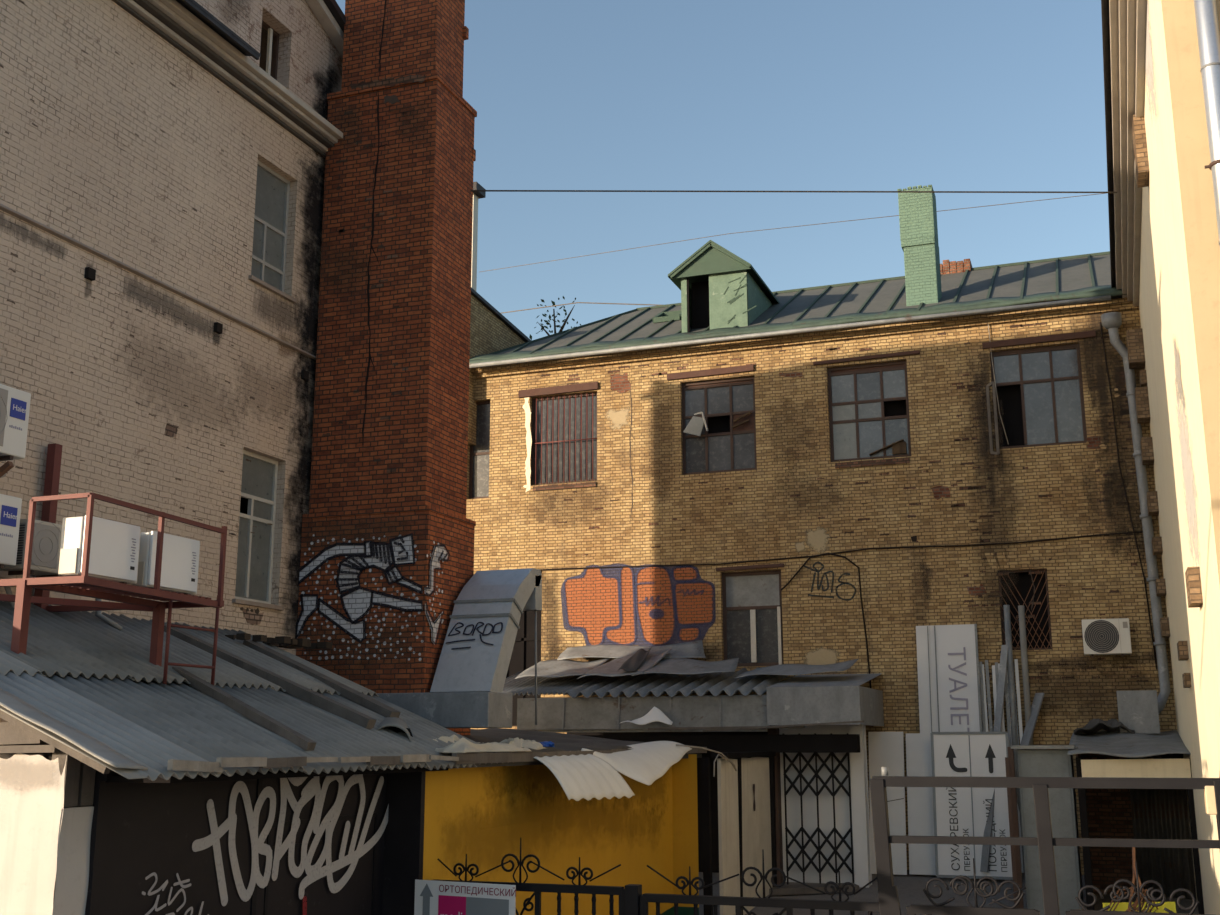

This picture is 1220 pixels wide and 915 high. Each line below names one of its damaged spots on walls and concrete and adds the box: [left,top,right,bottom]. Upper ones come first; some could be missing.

leakage [128,282,221,343]
crack [362,0,389,445]